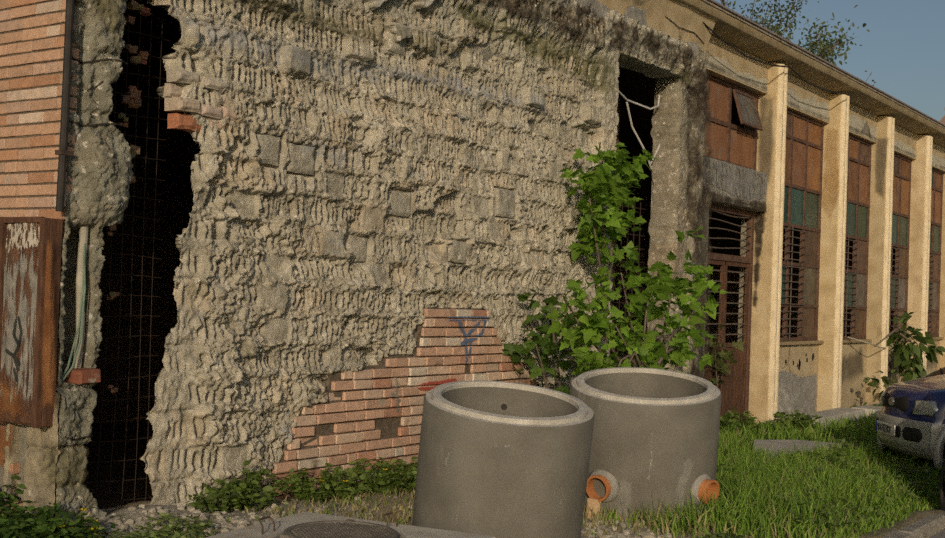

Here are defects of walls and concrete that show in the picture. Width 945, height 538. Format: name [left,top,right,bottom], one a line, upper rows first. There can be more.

rust [42,243,54,405]
spalling [1,0,134,536]
spalling [140,0,768,505]
damp [481,0,724,99]